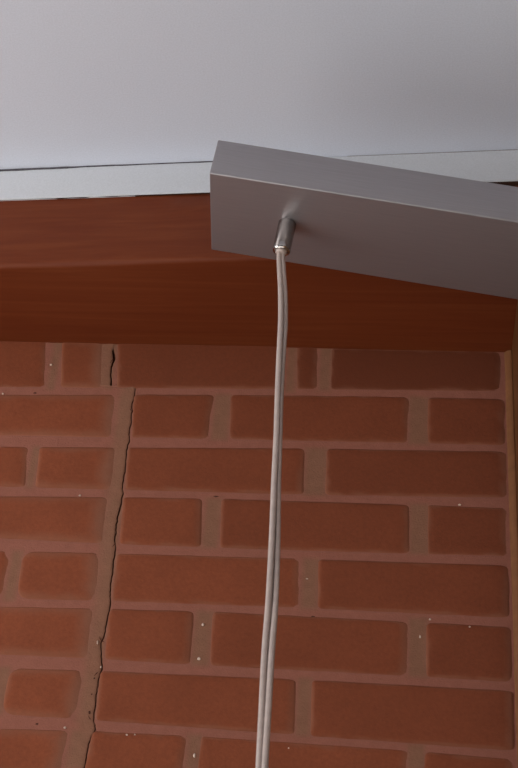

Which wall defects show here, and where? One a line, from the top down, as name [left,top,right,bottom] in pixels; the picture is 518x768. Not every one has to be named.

crack [108,351,116,386]
crack [84,389,136,768]